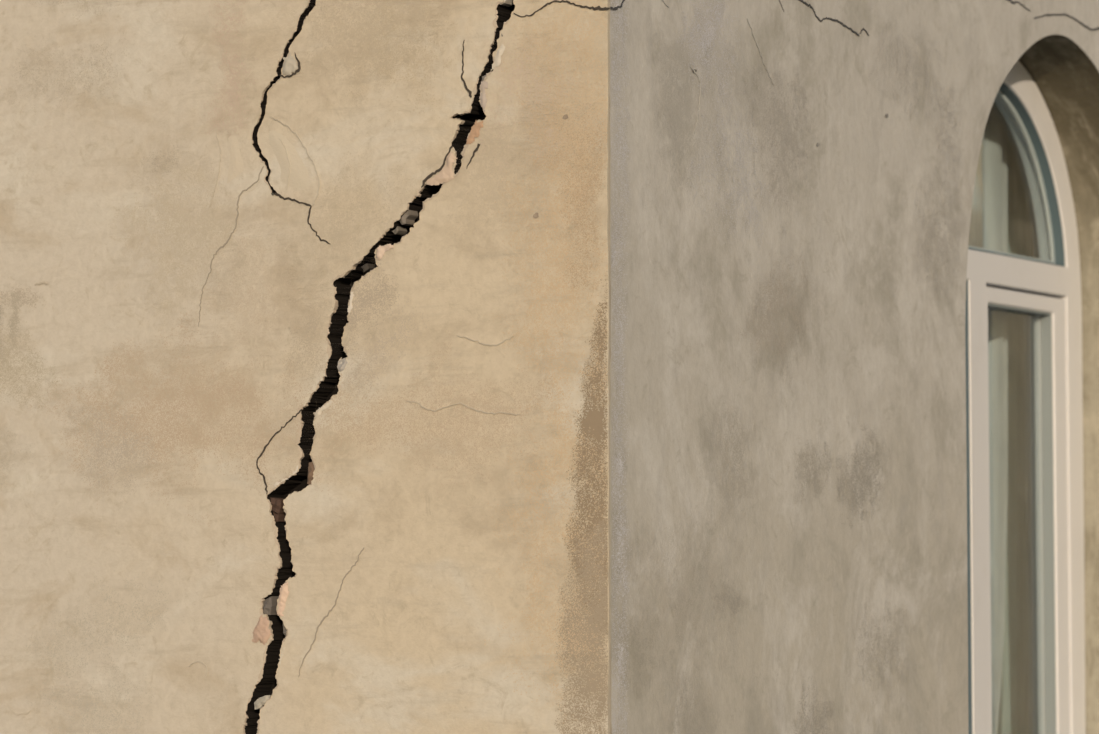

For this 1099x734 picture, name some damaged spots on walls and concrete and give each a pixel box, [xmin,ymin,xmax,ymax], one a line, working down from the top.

crack [198,0,330,326]
crack [779,0,869,36]
crack [1008,0,1099,31]
crack [245,0,625,734]